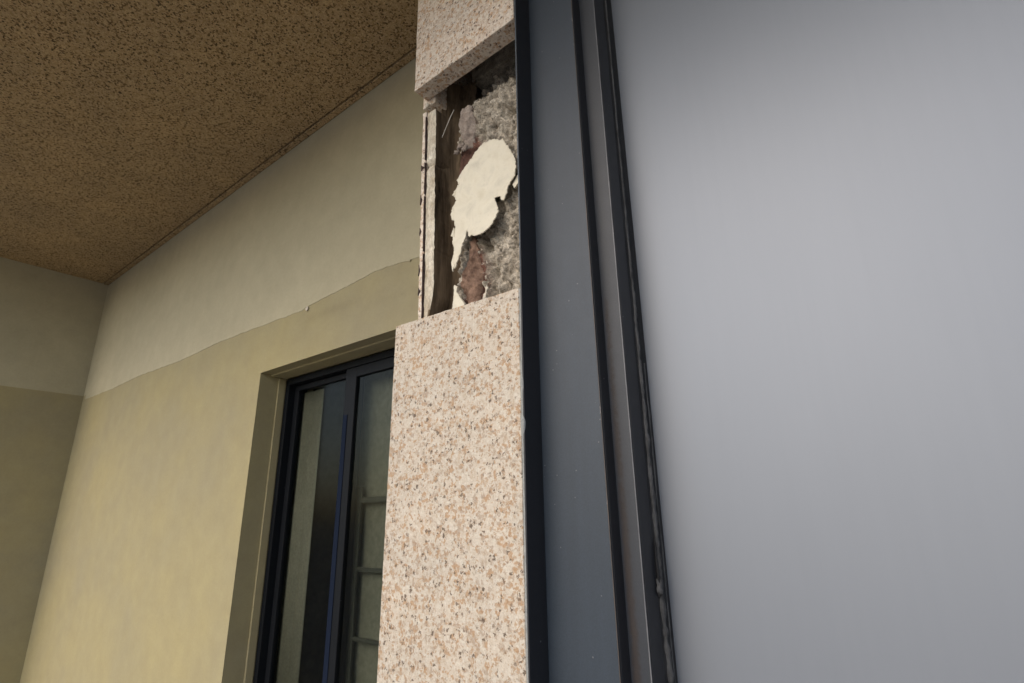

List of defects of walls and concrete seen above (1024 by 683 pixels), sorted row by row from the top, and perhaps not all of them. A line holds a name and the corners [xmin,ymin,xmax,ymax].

spalling [441,40,521,310]